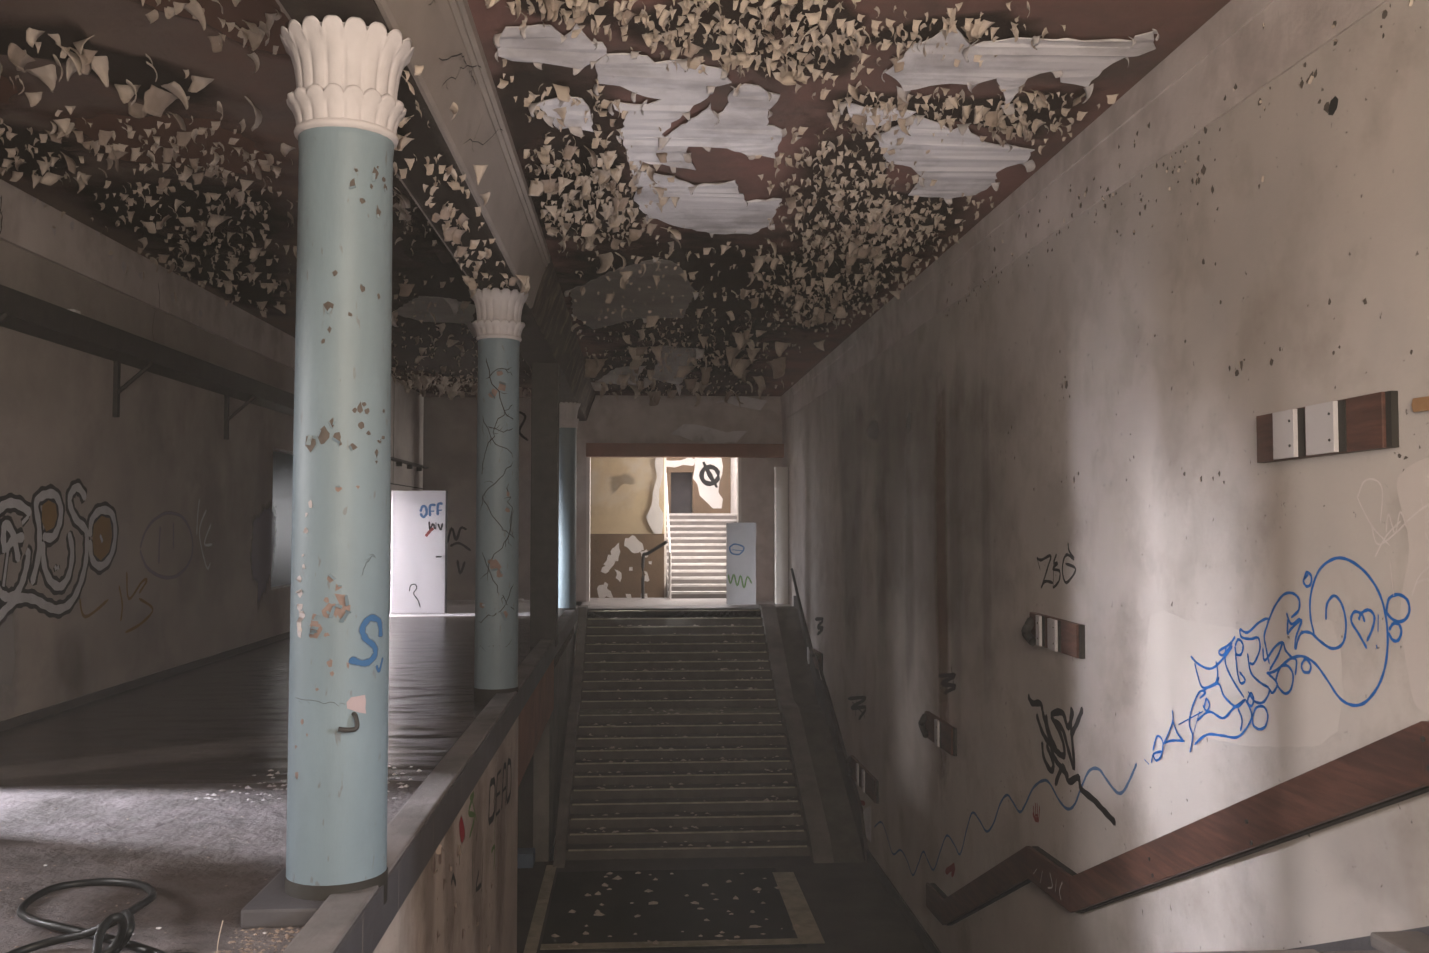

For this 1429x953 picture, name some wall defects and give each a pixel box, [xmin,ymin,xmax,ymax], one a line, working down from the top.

peeling [137,0,291,73]
peeling [1298,62,1317,89]
peeling [0,24,298,318]
peeling [349,65,532,400]
peeling [485,0,1160,410]
peeling [945,125,1221,318]
peeling [321,301,352,344]
peeling [295,554,351,638]
peeling [305,402,385,464]
peeling [597,424,747,598]